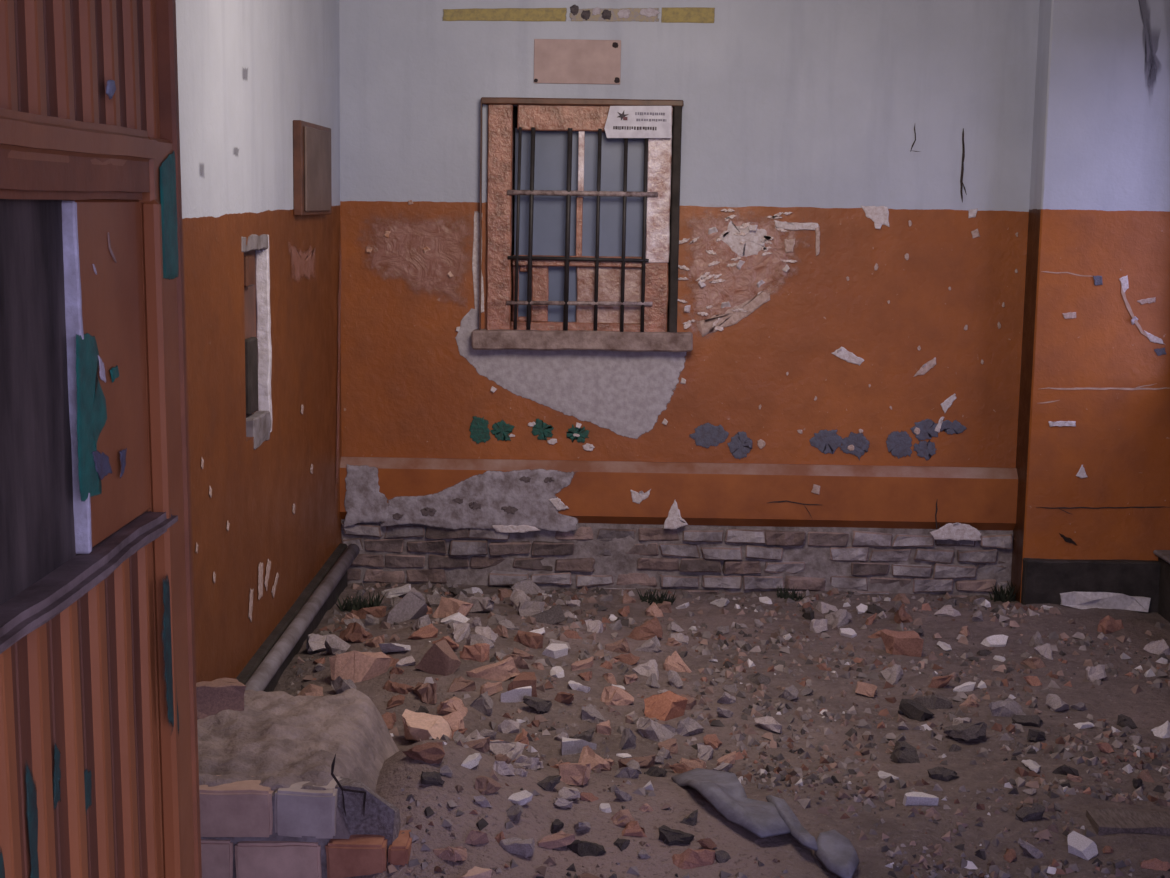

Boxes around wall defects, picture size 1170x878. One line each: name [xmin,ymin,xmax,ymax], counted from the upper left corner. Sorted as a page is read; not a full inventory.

peeling [366,211,686,451]
peeling [678,209,820,337]
peeling [861,206,890,229]
crack [959,128,967,203]
peeling [1119,276,1166,356]
flaking render [297,251,1013,764]